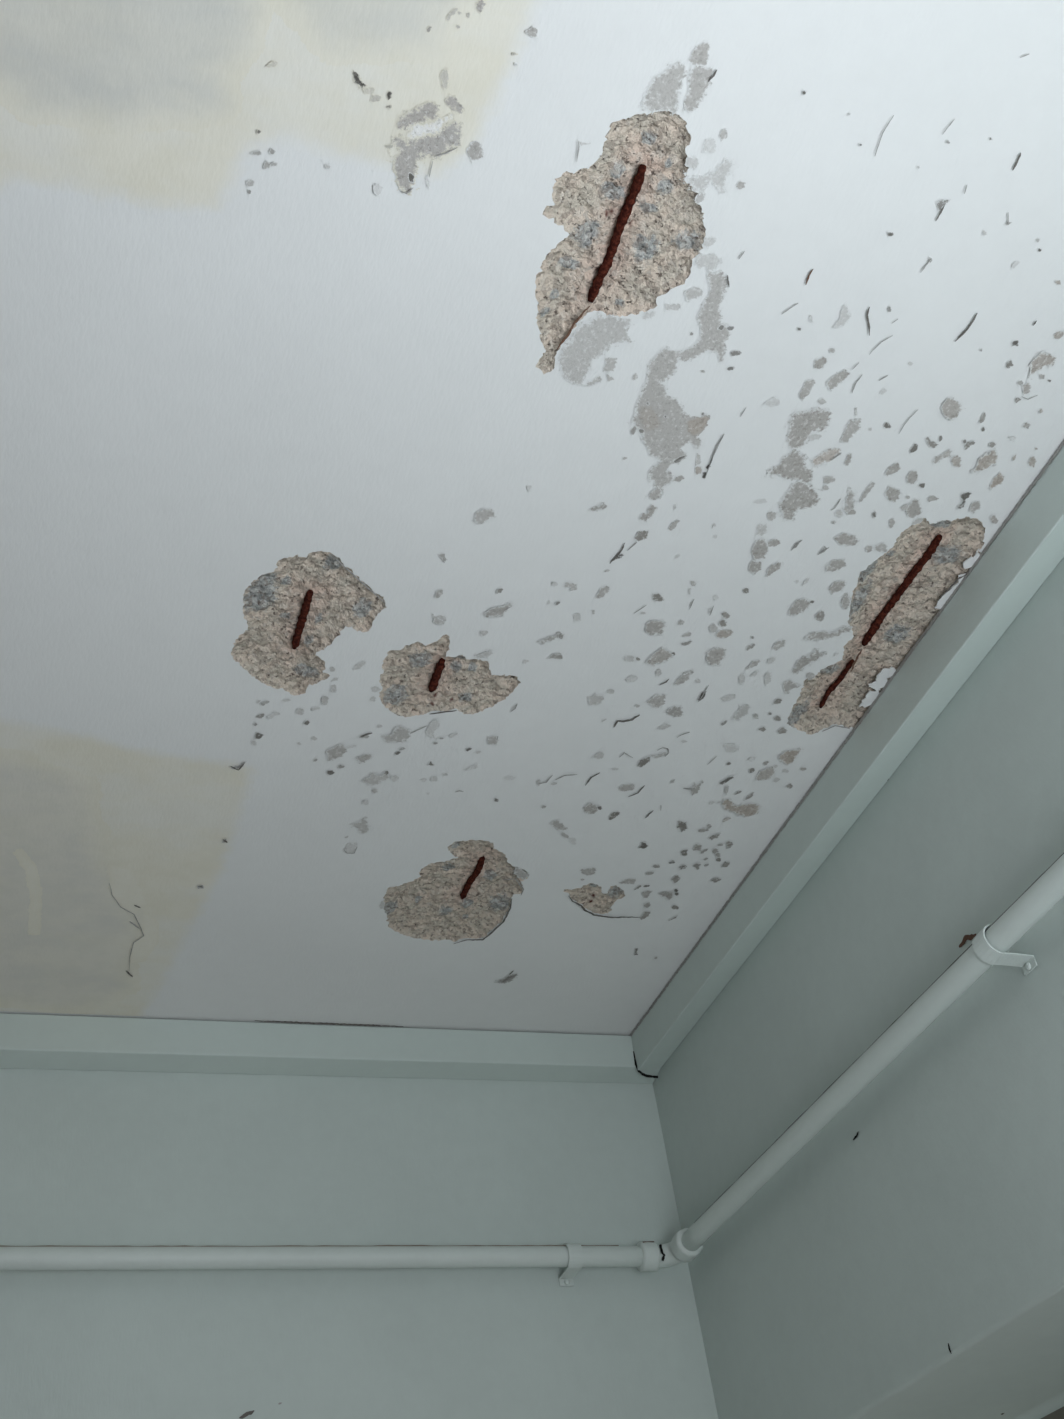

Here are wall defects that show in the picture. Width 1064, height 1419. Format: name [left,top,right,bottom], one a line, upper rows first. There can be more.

peeling [246,130,278,194]
leakage [0,0,549,218]
peeling [352,69,484,196]
peeling [936,185,967,220]
spalling [535,41,746,622]
spalling [231,551,530,853]
peeling [473,507,497,525]
spalling [537,304,1064,921]
leakage [0,715,262,1016]
spalling [379,840,530,944]